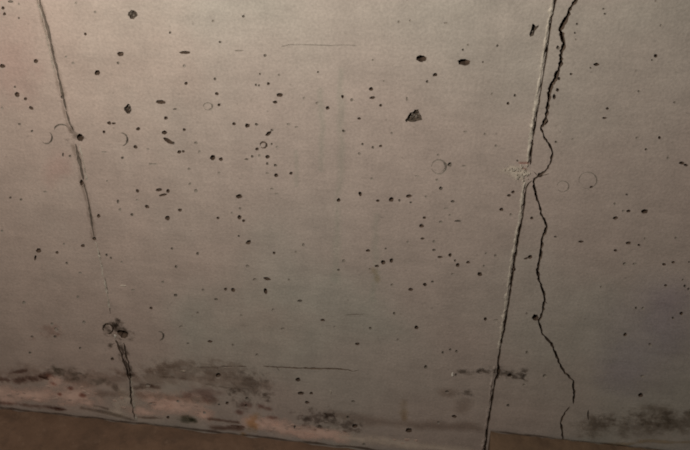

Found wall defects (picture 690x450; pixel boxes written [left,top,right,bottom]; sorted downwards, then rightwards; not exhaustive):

crack [112,340,135,419]
crack [532,0,589,439]